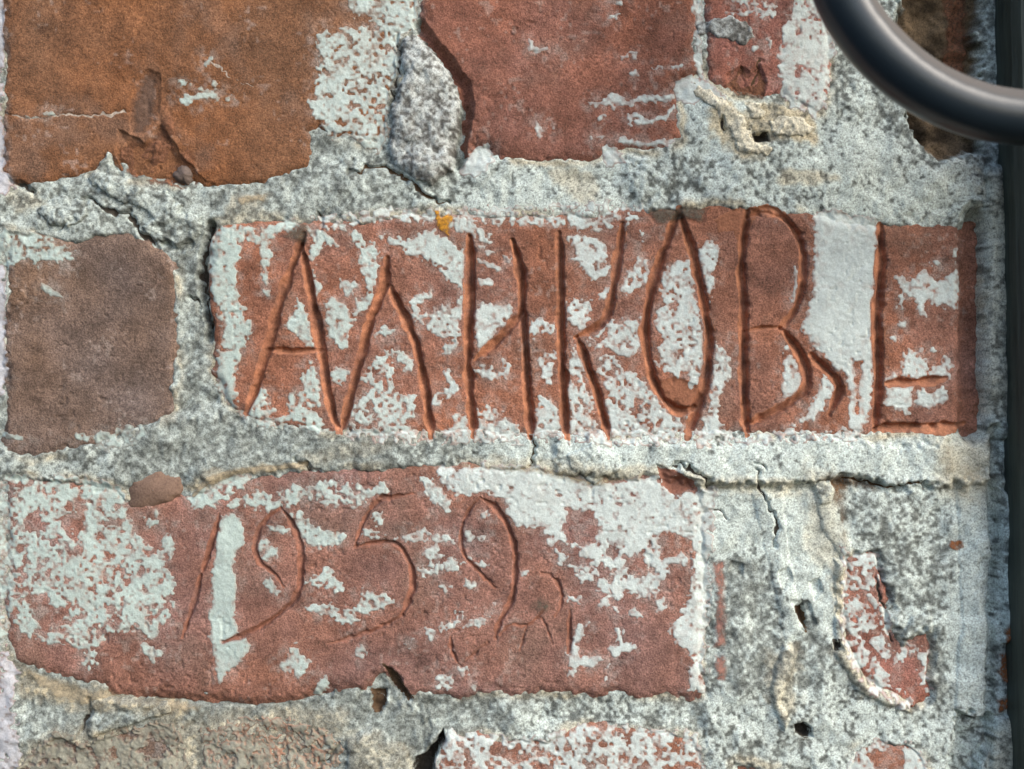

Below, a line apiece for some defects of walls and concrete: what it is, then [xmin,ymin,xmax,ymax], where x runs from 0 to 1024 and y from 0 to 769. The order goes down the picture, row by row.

crack [6,109,126,121]
peeling [307,0,421,155]
peeling [459,142,495,178]
peeling [588,0,765,168]
peeling [208,199,959,449]
peeling [0,472,344,769]
peeling [185,474,496,684]
peeling [419,460,719,694]
crack [672,462,727,520]
crack [757,464,779,547]
peeling [832,546,934,711]
crack [845,477,922,488]